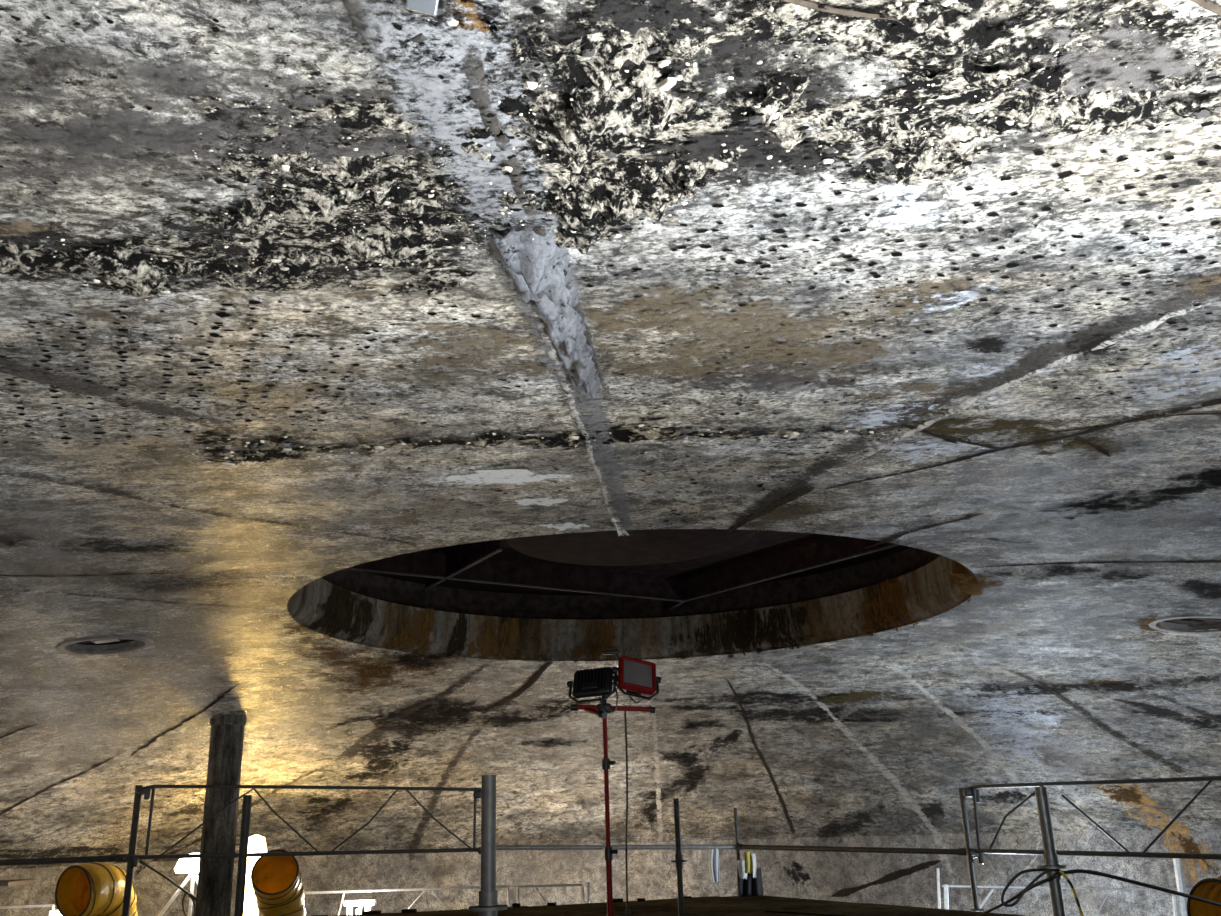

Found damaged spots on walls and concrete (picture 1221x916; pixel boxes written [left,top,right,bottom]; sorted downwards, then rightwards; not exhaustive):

spalling [0,0,1221,301]
crack [821,399,1221,491]
damp [1038,470,1221,523]
damp [995,566,1221,599]
rust [1136,615,1166,635]
crack [0,684,238,842]
rust [1094,784,1221,884]